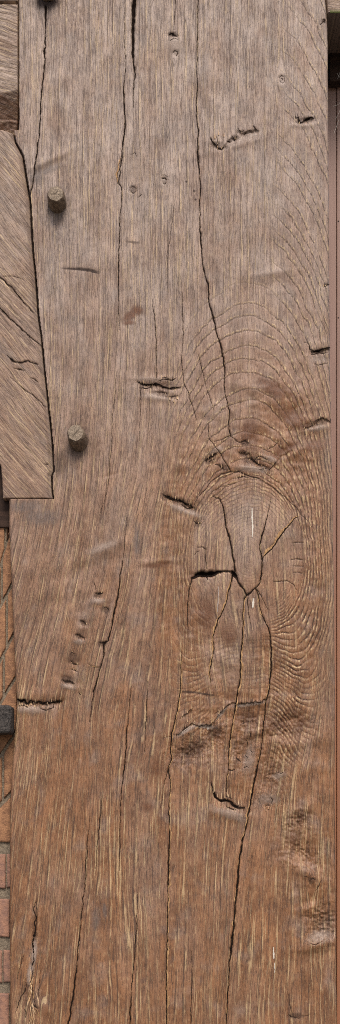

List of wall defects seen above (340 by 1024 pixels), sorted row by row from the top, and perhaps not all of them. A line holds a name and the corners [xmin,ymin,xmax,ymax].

crack [17,699,61,711]
crack [67,0,312,1024]